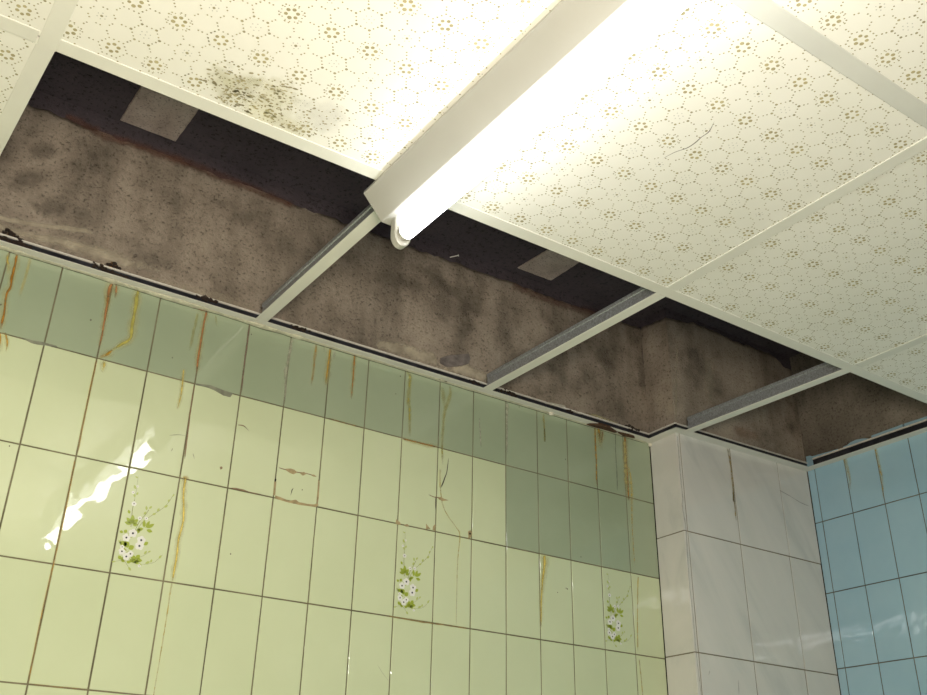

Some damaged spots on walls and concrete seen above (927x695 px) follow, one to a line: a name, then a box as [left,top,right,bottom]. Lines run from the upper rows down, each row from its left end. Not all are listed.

damp [199,60,328,138]
rust [0,255,18,345]
rust [100,284,117,342]
rust [104,291,139,365]
spalling [440,354,471,367]
spalling [195,383,233,397]
spalling [545,402,635,438]
spalling [806,416,927,462]
rust [173,477,186,577]